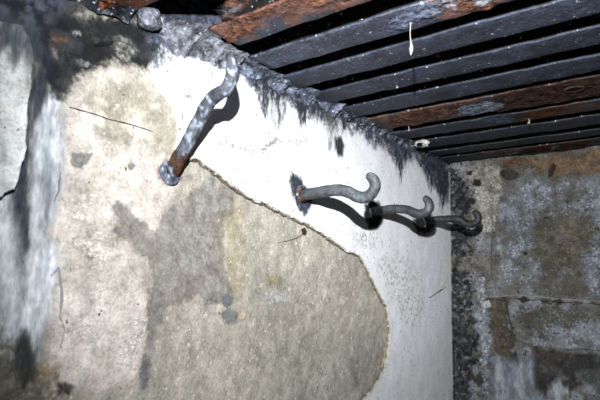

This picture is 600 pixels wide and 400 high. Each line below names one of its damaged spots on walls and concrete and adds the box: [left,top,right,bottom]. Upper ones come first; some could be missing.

flaking render [69,8,120,21]
water stain [255,80,286,124]
water stain [297,100,348,133]
water stain [388,142,407,177]
flaking render [0,15,391,400]
water stain [0,86,96,400]
water stain [71,177,246,369]
water stain [421,153,600,400]
crack [488,295,600,338]